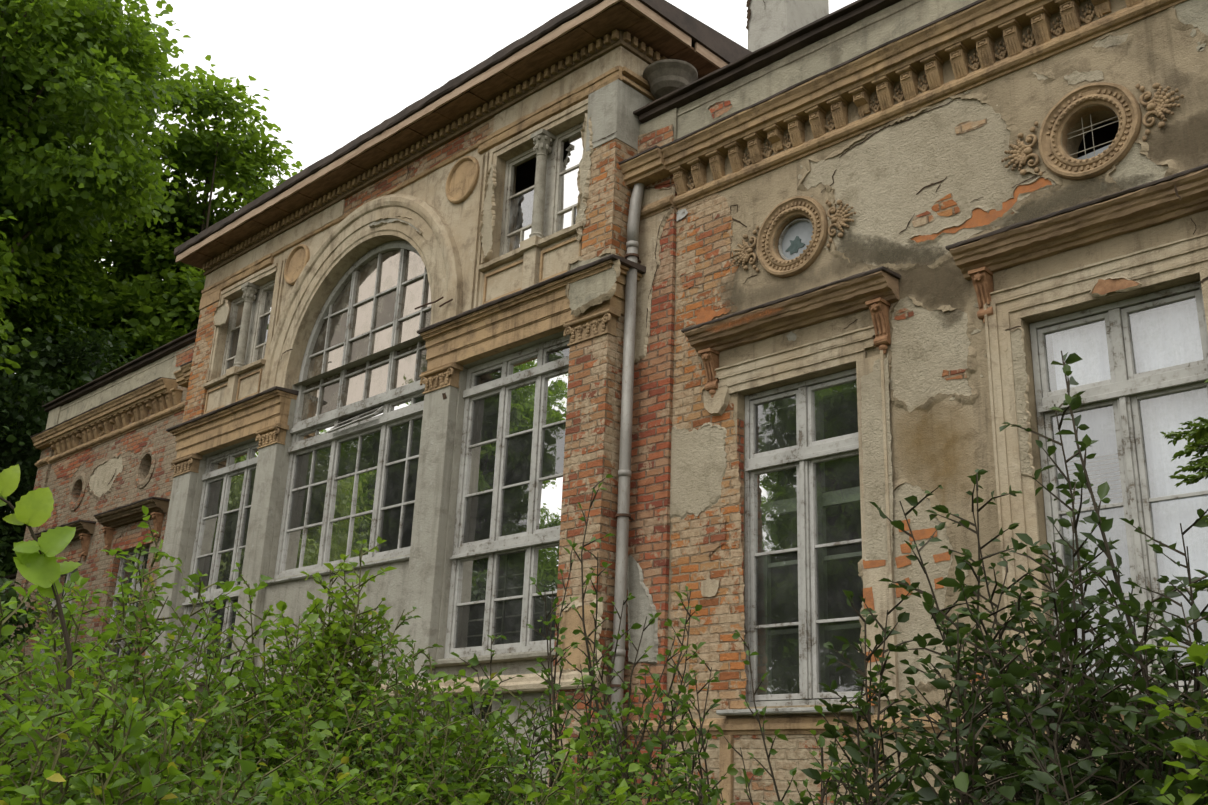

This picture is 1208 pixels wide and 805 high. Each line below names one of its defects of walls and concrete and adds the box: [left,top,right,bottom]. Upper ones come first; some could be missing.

flaking render [1167,0,1208,51]
flaking render [565,113,621,316]
peeling [638,124,674,153]
flaking render [797,90,1063,272]
damp [832,233,967,322]
flaking render [1089,276,1142,297]
flaking render [51,431,146,500]
flaking render [627,174,747,715]
flaking render [858,294,986,715]